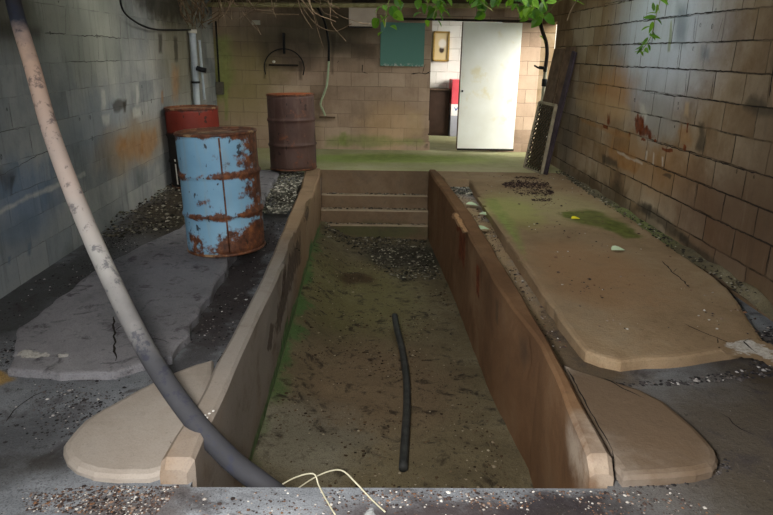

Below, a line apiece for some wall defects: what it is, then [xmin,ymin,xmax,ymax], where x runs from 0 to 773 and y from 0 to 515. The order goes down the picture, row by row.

corrosion [108,119,162,171]
corrosion [605,111,674,180]
crack [112,317,121,361]
spalling [714,337,773,366]